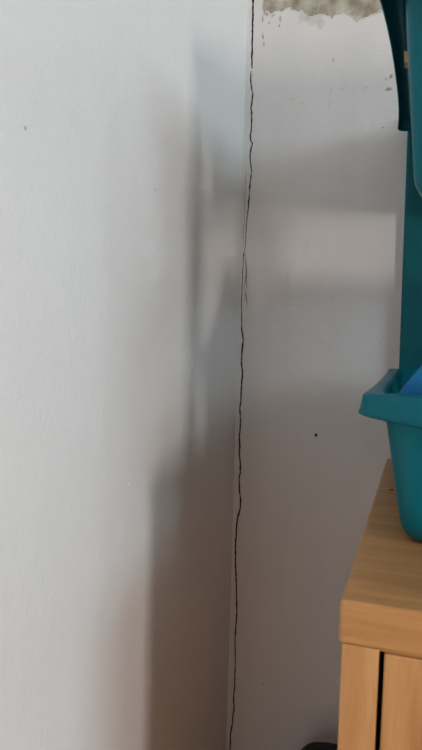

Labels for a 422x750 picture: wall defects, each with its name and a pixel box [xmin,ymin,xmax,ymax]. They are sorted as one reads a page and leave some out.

crack [229,0,254,750]